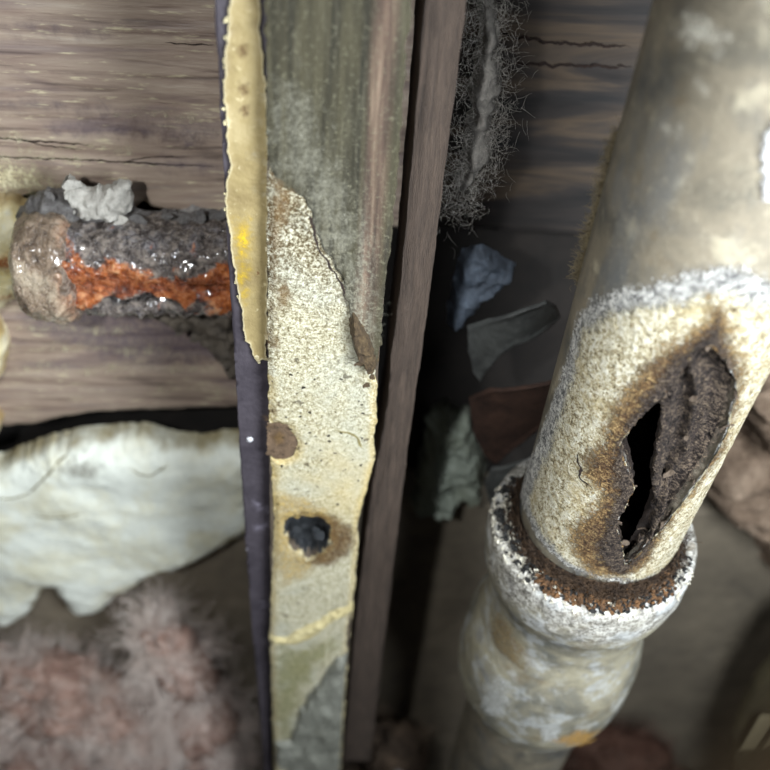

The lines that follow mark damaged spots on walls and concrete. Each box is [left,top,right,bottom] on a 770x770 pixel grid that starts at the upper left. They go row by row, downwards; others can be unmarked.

peeling [265,422,298,459]
corrosion [567,293,752,579]